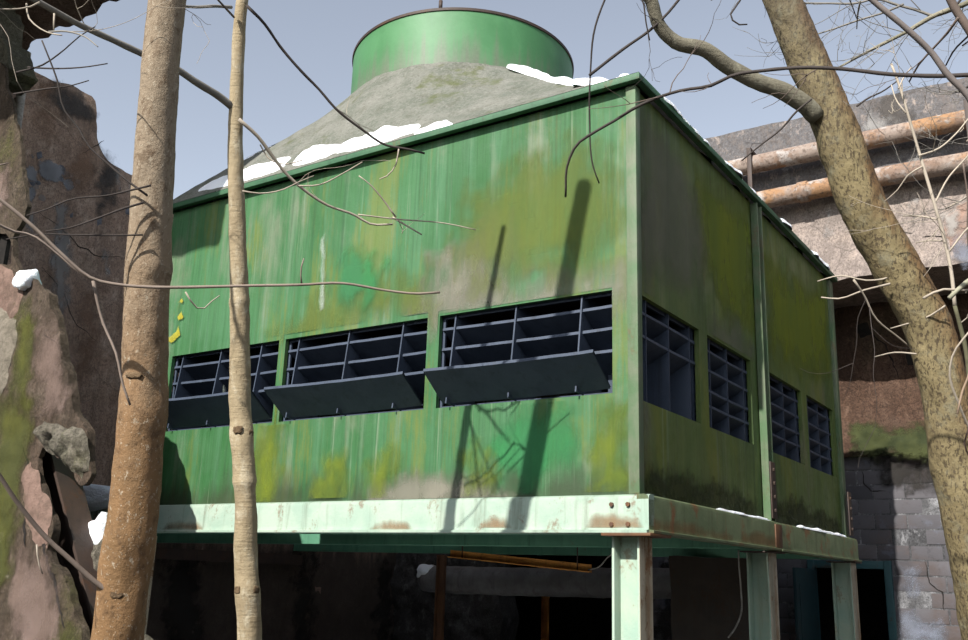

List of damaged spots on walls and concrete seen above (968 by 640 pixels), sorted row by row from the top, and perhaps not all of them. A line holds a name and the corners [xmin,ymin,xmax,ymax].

spalling [942,202,968,261]
corrosion [591,517,637,528]